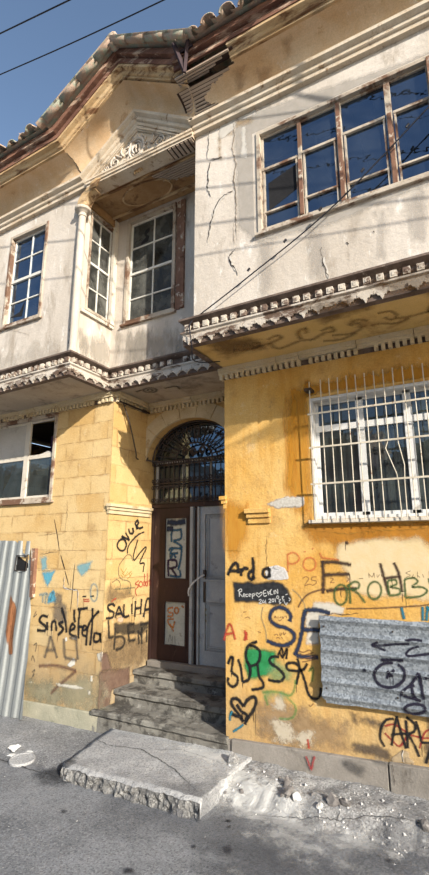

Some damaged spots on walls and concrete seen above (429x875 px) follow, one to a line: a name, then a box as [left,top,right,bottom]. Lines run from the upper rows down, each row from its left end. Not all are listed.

crack [206,124,238,275]
peeling [337,538,429,600]